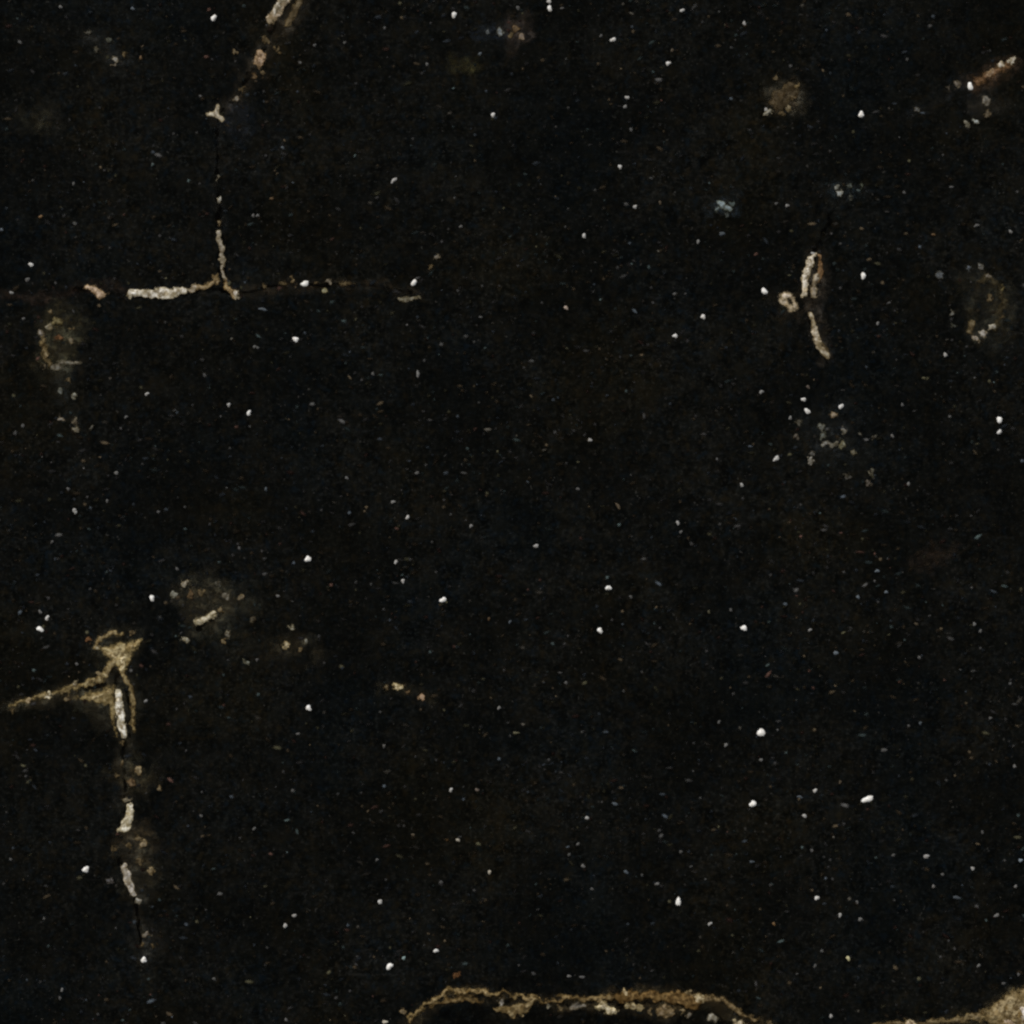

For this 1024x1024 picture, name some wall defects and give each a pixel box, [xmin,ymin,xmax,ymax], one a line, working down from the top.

crack [74,0,355,299]
crack [398,290,421,302]
crack [801,215,831,359]
spalling [399,972,772,1024]
spalling [873,989,1024,1024]